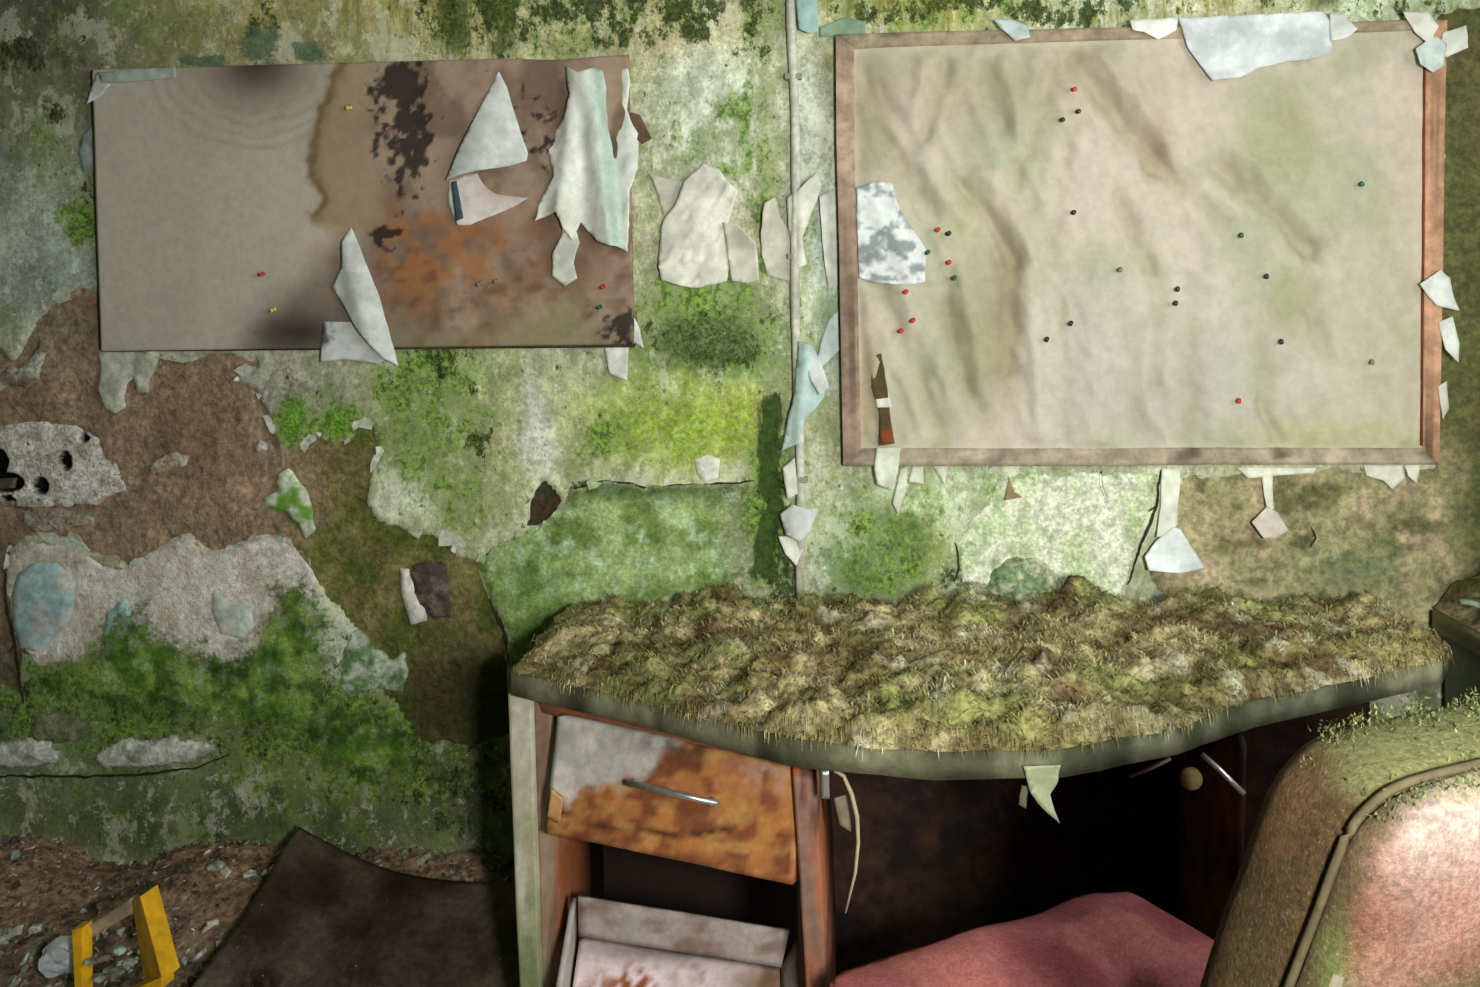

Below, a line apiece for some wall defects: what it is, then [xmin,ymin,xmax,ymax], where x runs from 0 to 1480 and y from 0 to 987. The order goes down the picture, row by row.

damp [180,55,224,67]
damp [241,26,324,63]
damp [438,0,472,57]
damp [489,0,521,52]
flaking render [1145,8,1480,625]
peeling [695,455,720,481]
flaking render [0,282,510,745]
flaking render [521,476,561,530]